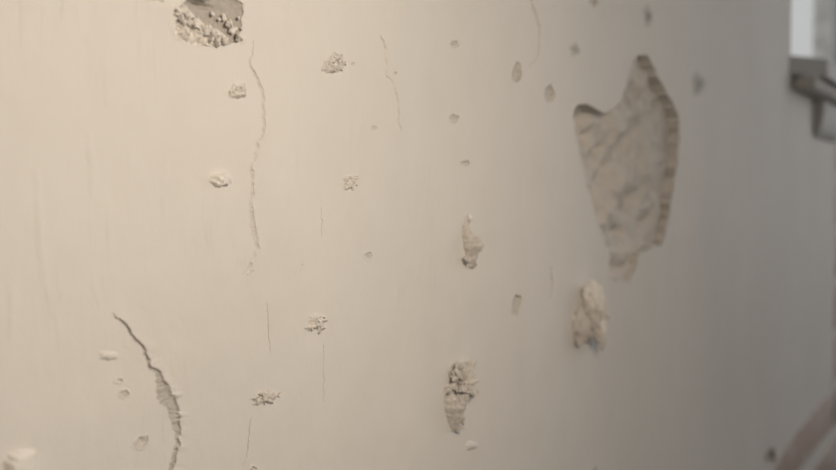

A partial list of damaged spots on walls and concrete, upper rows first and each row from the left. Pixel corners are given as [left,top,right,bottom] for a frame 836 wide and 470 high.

spalling [168,0,248,50]
spalling [321,52,355,74]
crack [242,40,270,275]
spalling [570,53,681,284]
peeling [462,214,484,267]
crack [113,310,194,470]
peeling [443,358,480,431]